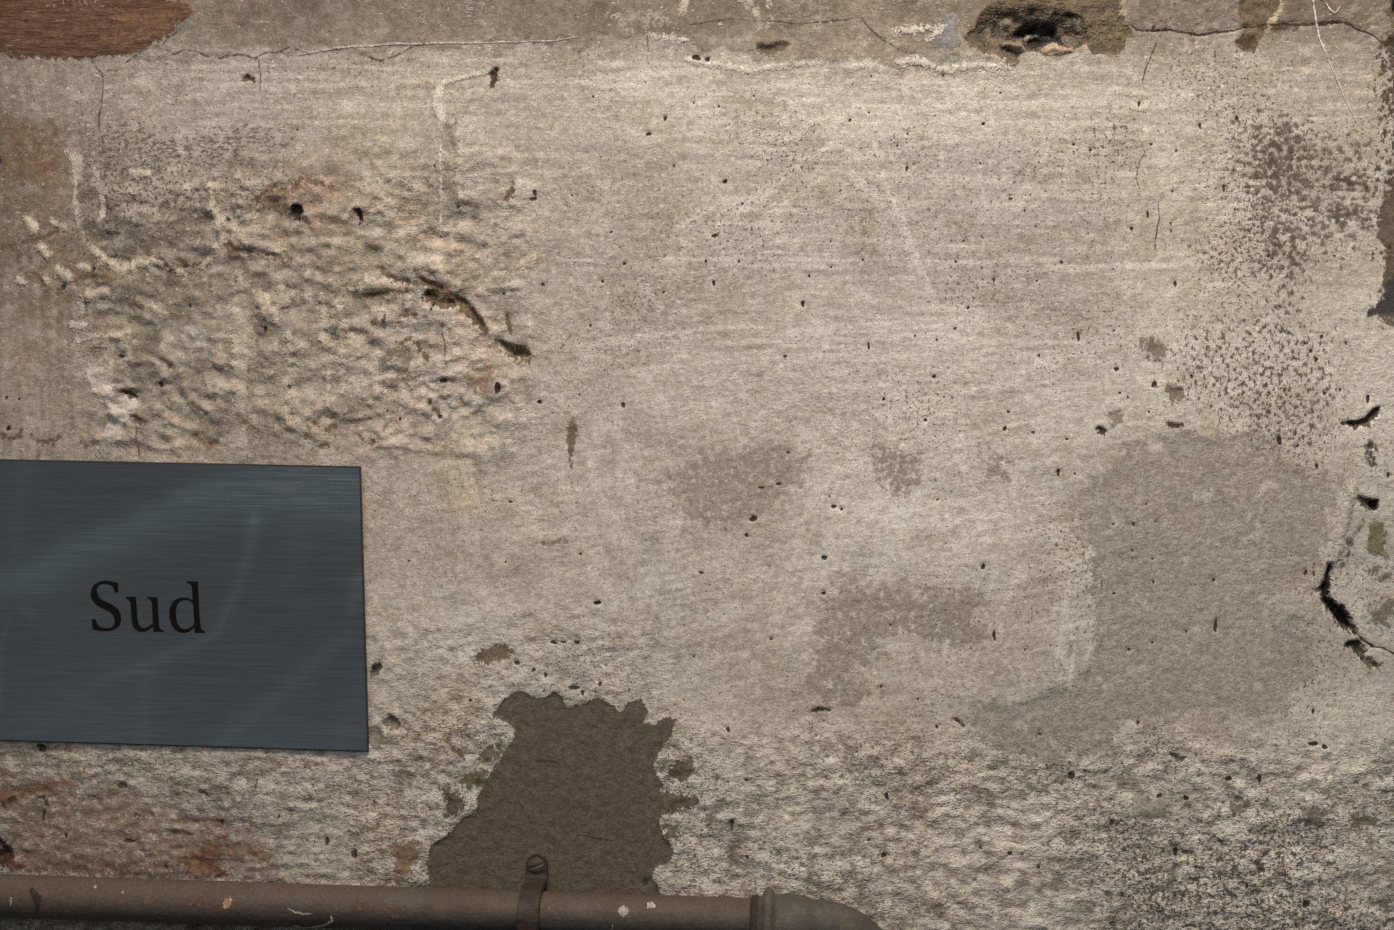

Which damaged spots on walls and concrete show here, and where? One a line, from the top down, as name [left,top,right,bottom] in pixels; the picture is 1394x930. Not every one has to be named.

peeling [605,0,820,75]
spalling [841,0,1135,77]
leakage [1170,35,1394,461]
crack [1315,479,1394,673]
spalling [0,836,23,870]